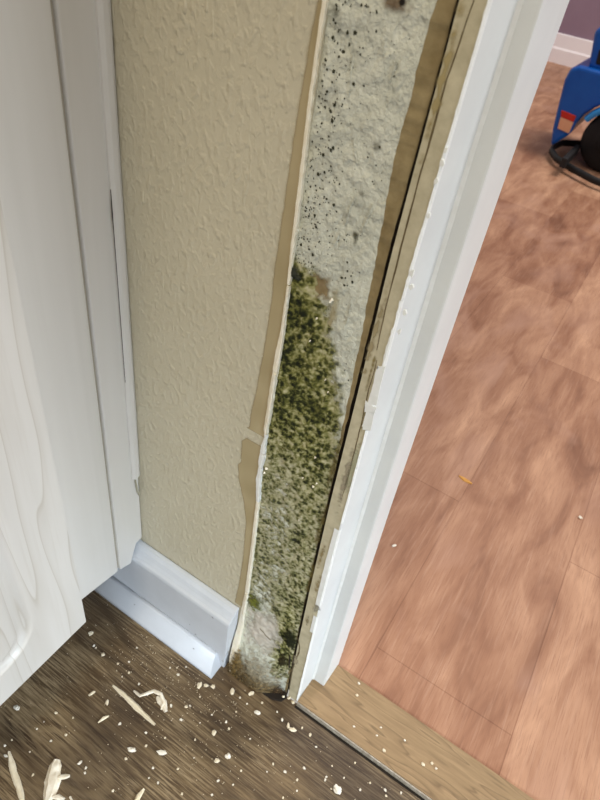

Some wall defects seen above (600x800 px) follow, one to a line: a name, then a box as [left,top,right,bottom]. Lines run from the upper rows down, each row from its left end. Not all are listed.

peeling [229,0,329,672]
damp [227,0,378,694]
damp [363,309,383,380]
spalling [285,0,493,700]